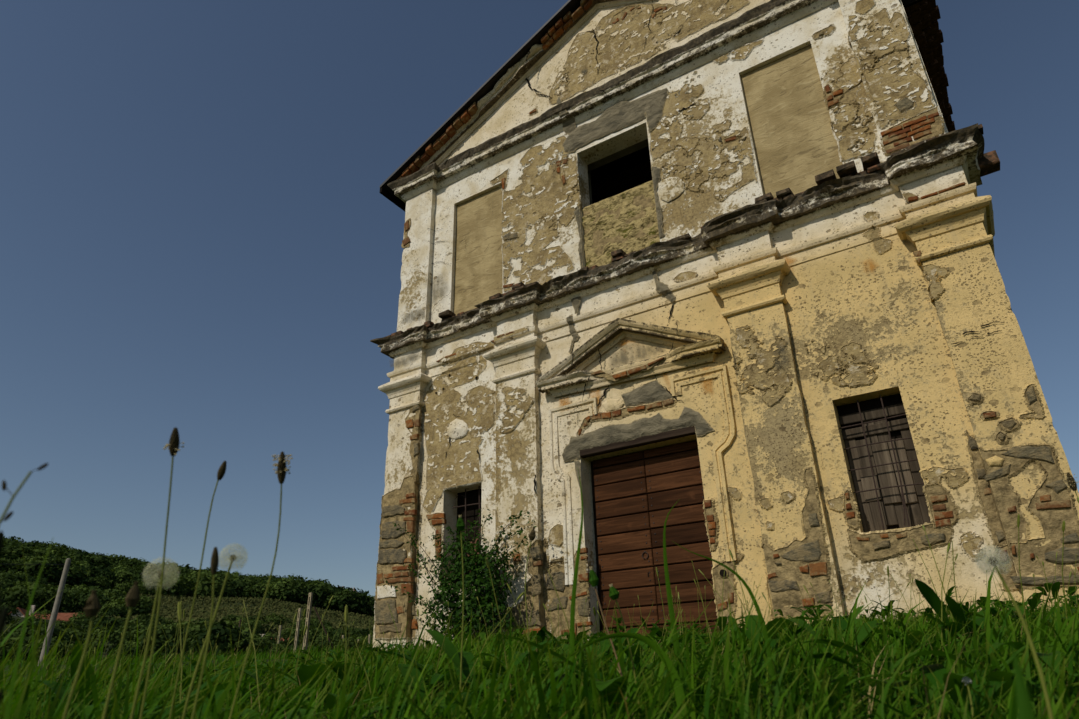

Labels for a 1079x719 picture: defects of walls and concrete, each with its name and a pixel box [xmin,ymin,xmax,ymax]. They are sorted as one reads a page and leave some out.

crack [587,29,606,93]
peeling [548,0,750,105]
peeling [649,71,757,203]
peeling [713,40,765,65]
peeling [811,0,945,162]
peeling [490,135,581,292]
peeling [374,326,534,641]
spalling [703,498,744,627]
spalling [758,383,1079,620]